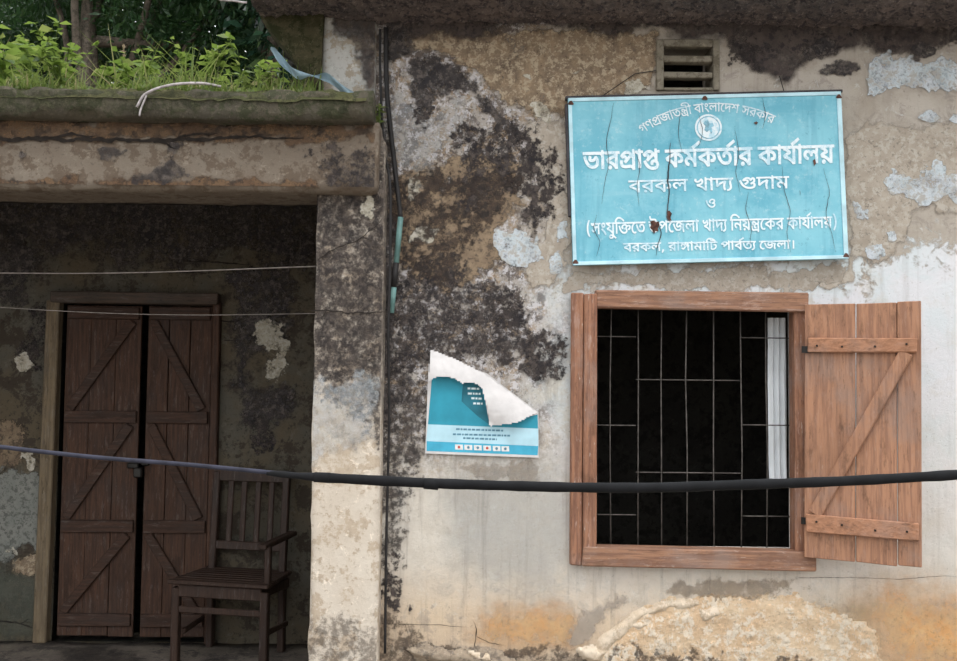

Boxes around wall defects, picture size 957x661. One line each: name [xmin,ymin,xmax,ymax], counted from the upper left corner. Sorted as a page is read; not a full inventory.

damp [553,22,957,82]
crack [0,132,304,149]
spalling [251,0,957,294]
peeling [14,352,34,372]
peeling [253,318,290,383]
damp [0,18,569,661]
peeling [0,419,39,576]
damp [504,644,587,661]
spalling [595,598,699,651]